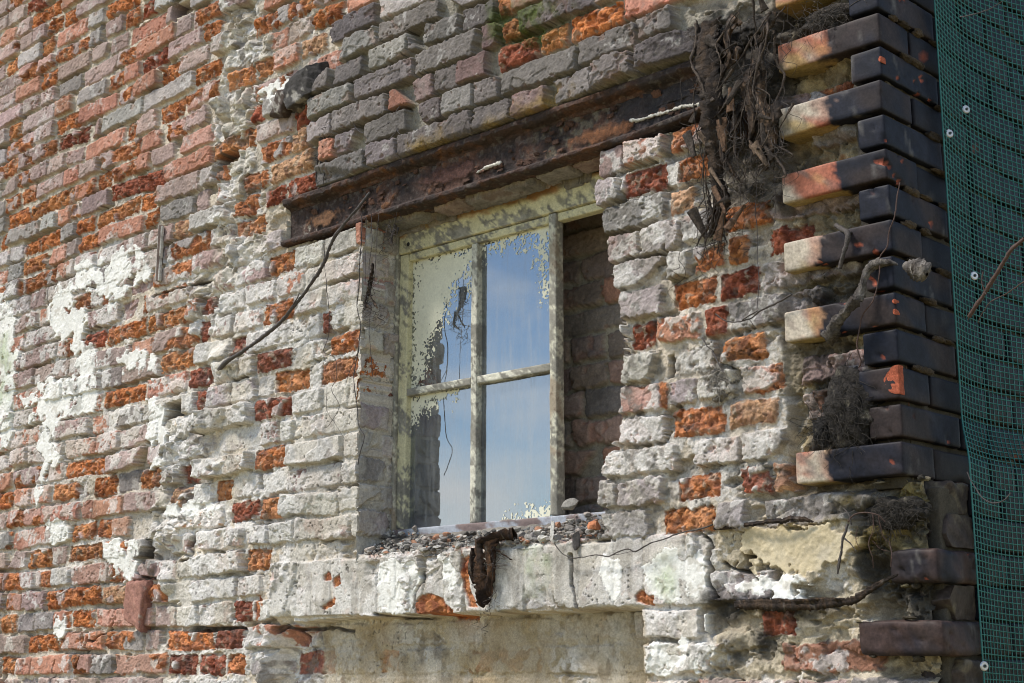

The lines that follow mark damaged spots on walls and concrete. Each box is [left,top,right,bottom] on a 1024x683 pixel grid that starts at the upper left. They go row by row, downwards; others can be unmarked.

spalling [128,123,137,142]
spalling [162,0,346,238]
rust [305,104,636,227]
rust [639,89,692,118]
peeling [0,170,219,675]
spalling [164,465,282,523]
peeling [377,554,478,616]
peeling [735,549,811,637]